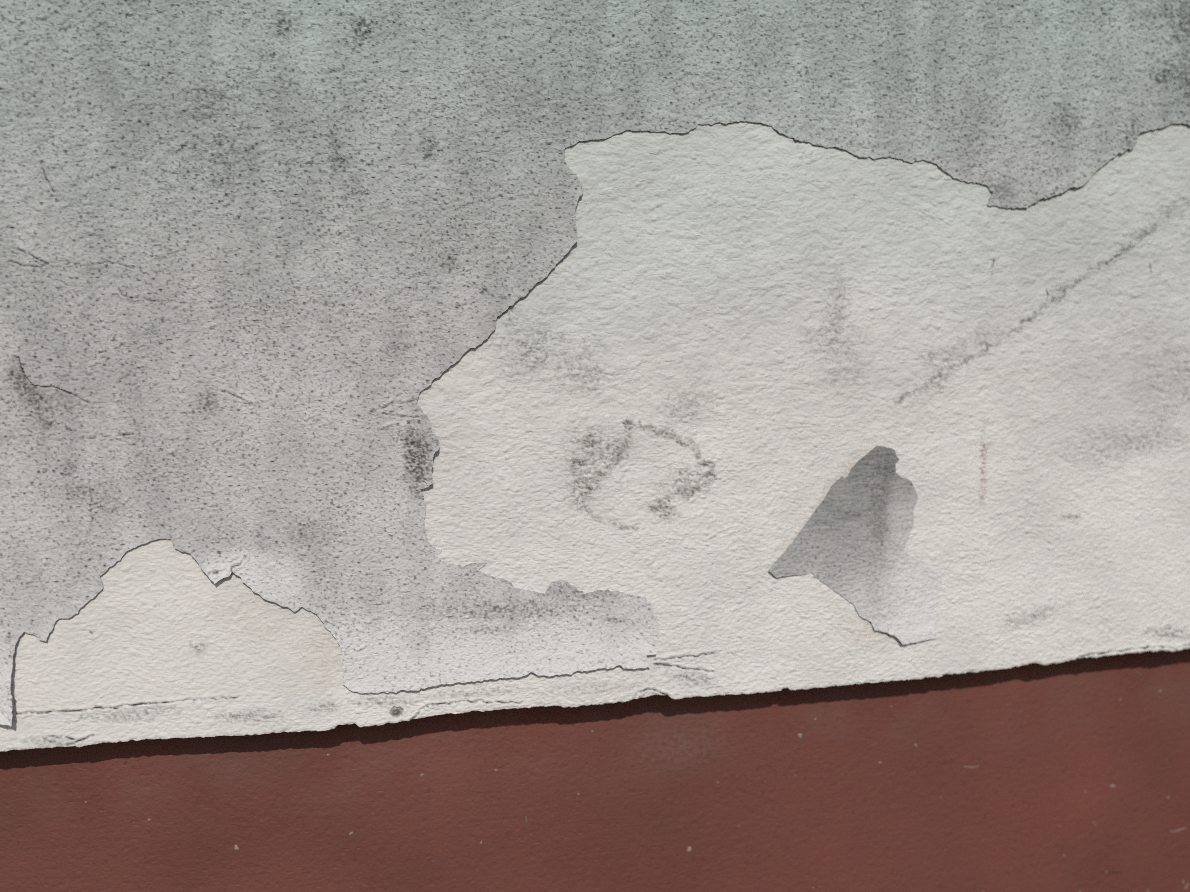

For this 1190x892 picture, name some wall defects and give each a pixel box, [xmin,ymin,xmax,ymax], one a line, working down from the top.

peeling [0,116,1190,751]